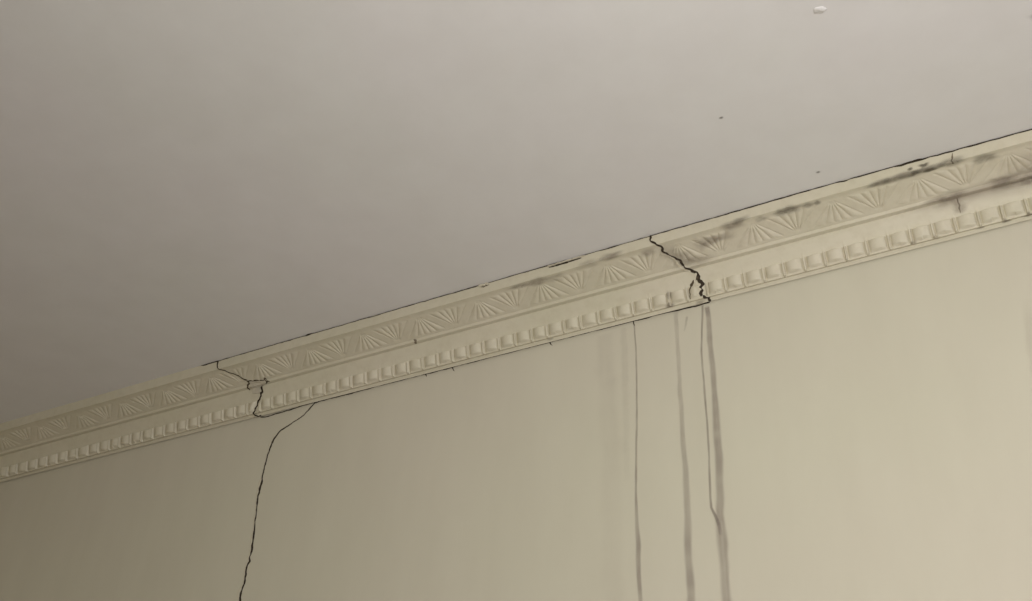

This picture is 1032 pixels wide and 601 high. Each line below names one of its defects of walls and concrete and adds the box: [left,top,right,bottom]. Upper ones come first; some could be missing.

crack [201,129,1032,601]